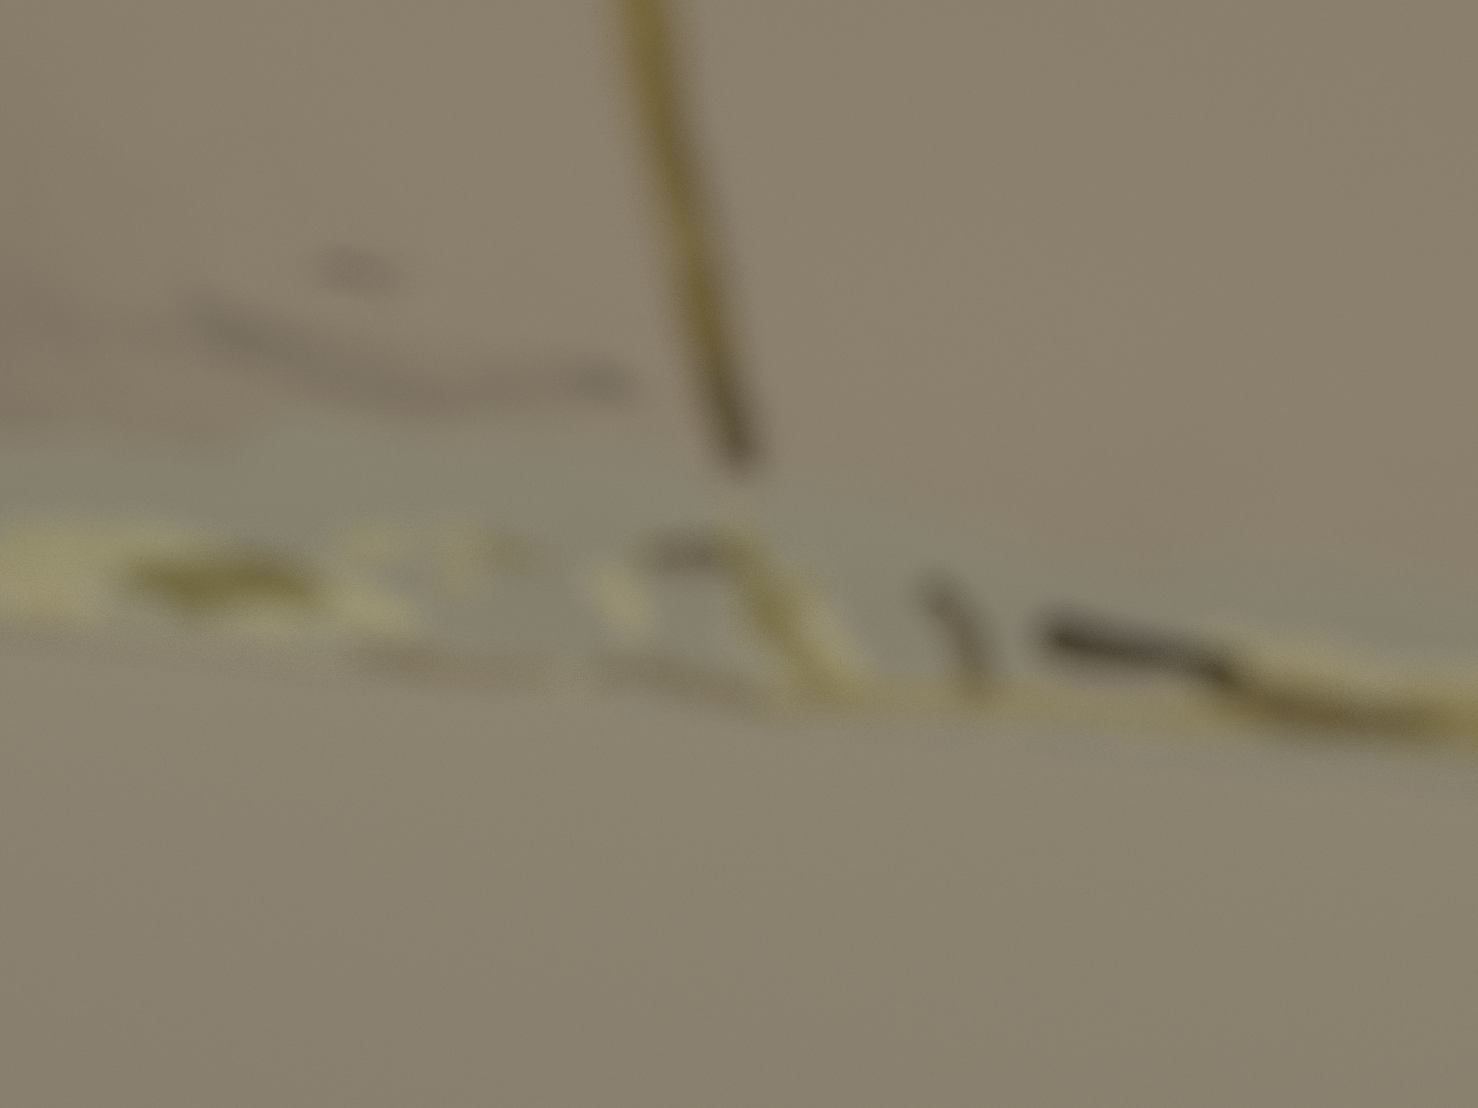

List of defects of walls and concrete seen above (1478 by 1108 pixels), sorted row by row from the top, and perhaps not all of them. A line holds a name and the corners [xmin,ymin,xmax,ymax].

crack [613,0,757,479]
water stain [3,528,410,624]
spalling [1036,619,1245,691]